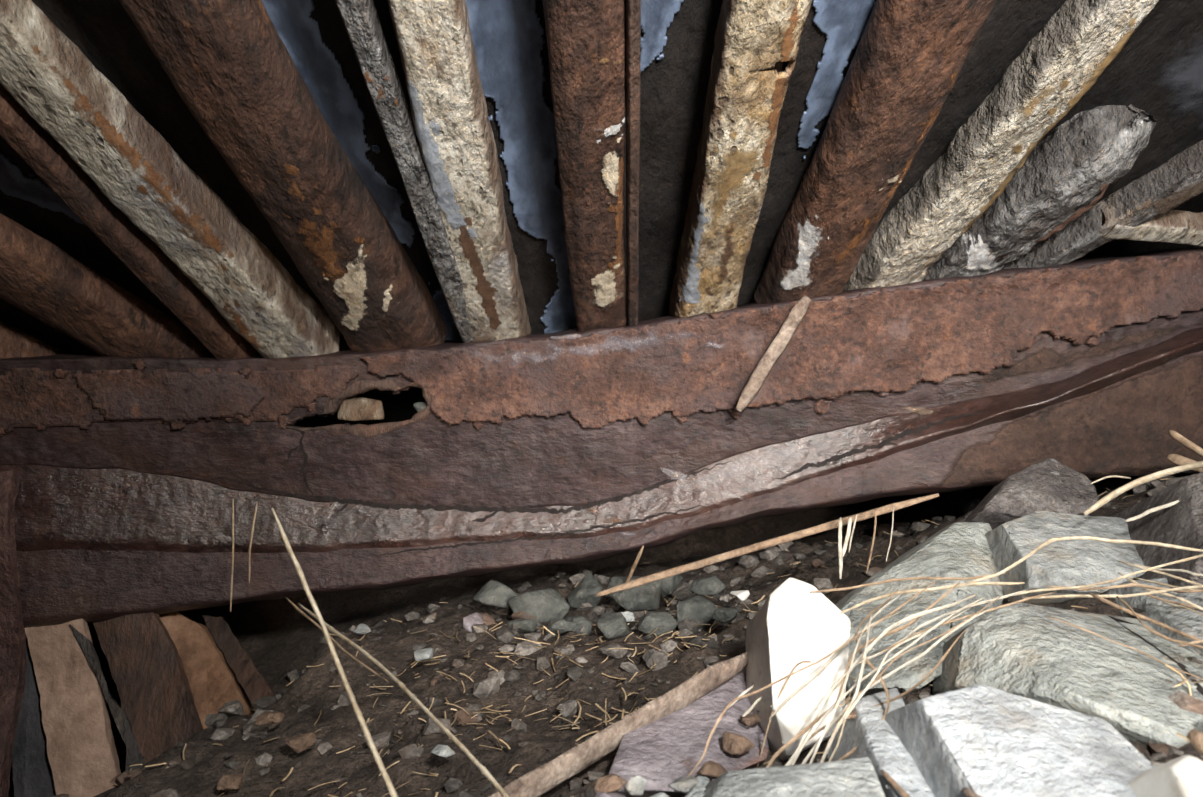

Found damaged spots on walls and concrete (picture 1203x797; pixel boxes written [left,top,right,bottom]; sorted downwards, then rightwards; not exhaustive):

rust [780,3,800,61]
rust [51,66,234,271]
rust [282,164,347,282]
rust [607,158,624,288]
rust [714,77,788,221]
rust [835,105,942,264]
rust [0,217,1203,436]